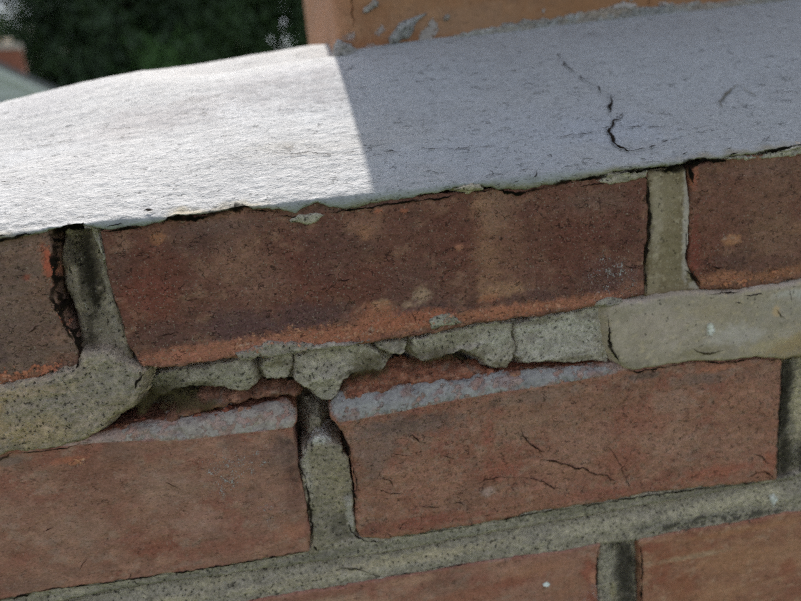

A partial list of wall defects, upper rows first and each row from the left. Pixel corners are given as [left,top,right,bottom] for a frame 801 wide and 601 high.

crack [545,54,667,151]
crack [762,136,801,154]
crack [326,152,738,292]
spalling [150,306,607,433]
crack [607,320,681,373]
crack [342,436,358,501]
crack [348,345,795,542]